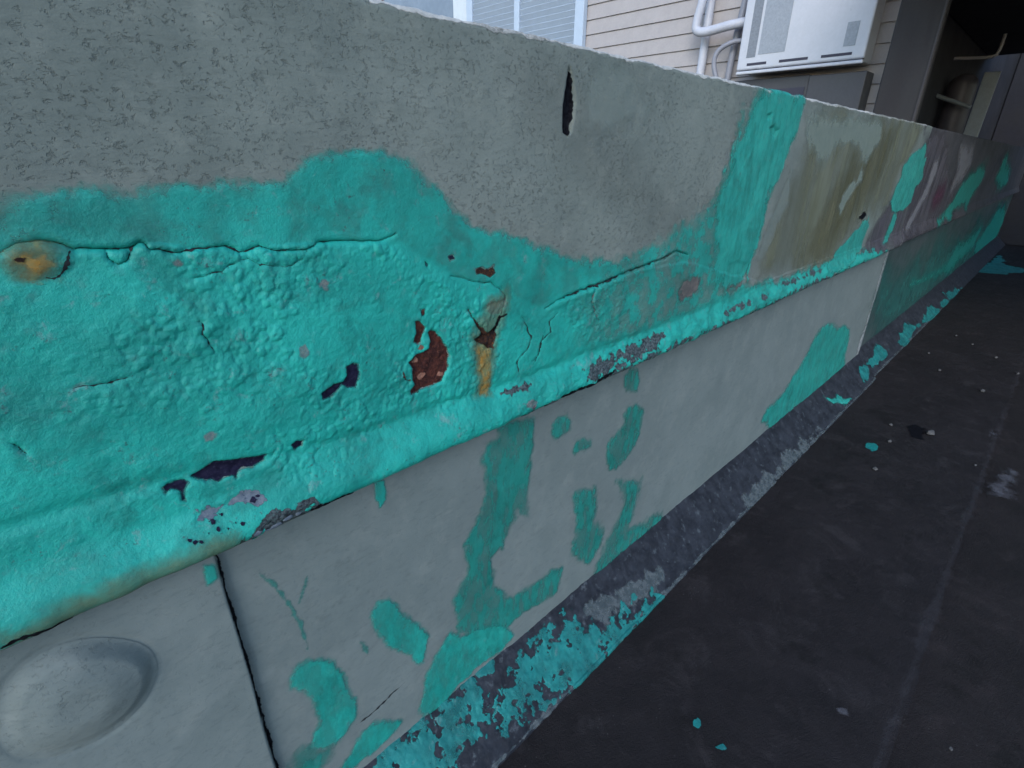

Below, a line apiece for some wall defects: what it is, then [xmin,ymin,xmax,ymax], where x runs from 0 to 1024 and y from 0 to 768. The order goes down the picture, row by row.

crack [562,72,573,136]
leakage [763,109,973,270]
crack [75,240,340,276]
peeling [322,363,360,400]
corrosion [468,309,507,394]
crack [452,252,682,397]
peeling [582,265,846,389]
peeling [163,454,266,500]
peeling [188,490,323,545]